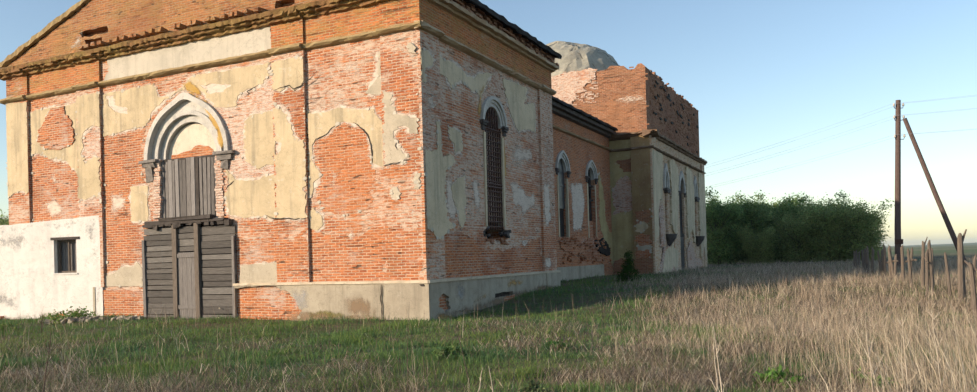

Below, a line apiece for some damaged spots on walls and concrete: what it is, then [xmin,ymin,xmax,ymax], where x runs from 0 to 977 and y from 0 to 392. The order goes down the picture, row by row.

spalling [551,68,599,106]
spalling [653,80,698,153]
peeling [31,119,150,273]
peeling [171,67,543,320]
spalling [559,158,666,275]
spalling [103,277,144,316]